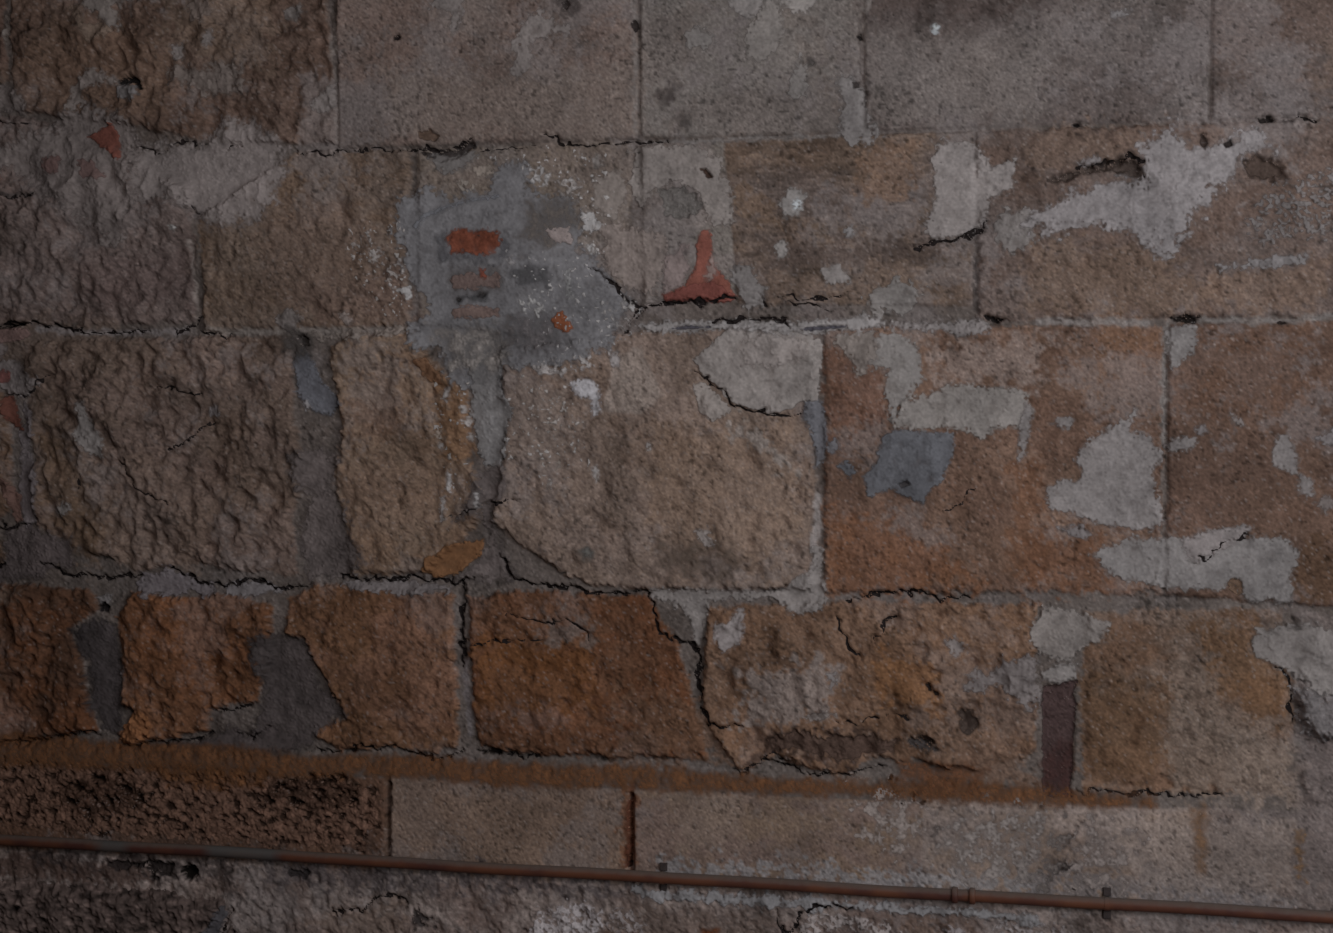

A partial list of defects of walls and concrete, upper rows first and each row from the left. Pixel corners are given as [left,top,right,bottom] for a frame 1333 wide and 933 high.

crack [297,147,411,157]
crack [480,134,669,152]
flaking render [446,228,503,256]
flaking render [546,226,573,244]
crack [913,220,987,253]
peeling [994,206,1036,255]
flaking render [551,311,573,332]
peeling [833,275,928,377]
peeling [1181,526,1251,560]
crack [40,562,311,591]
crack [342,556,741,729]
rust [624,798,634,867]